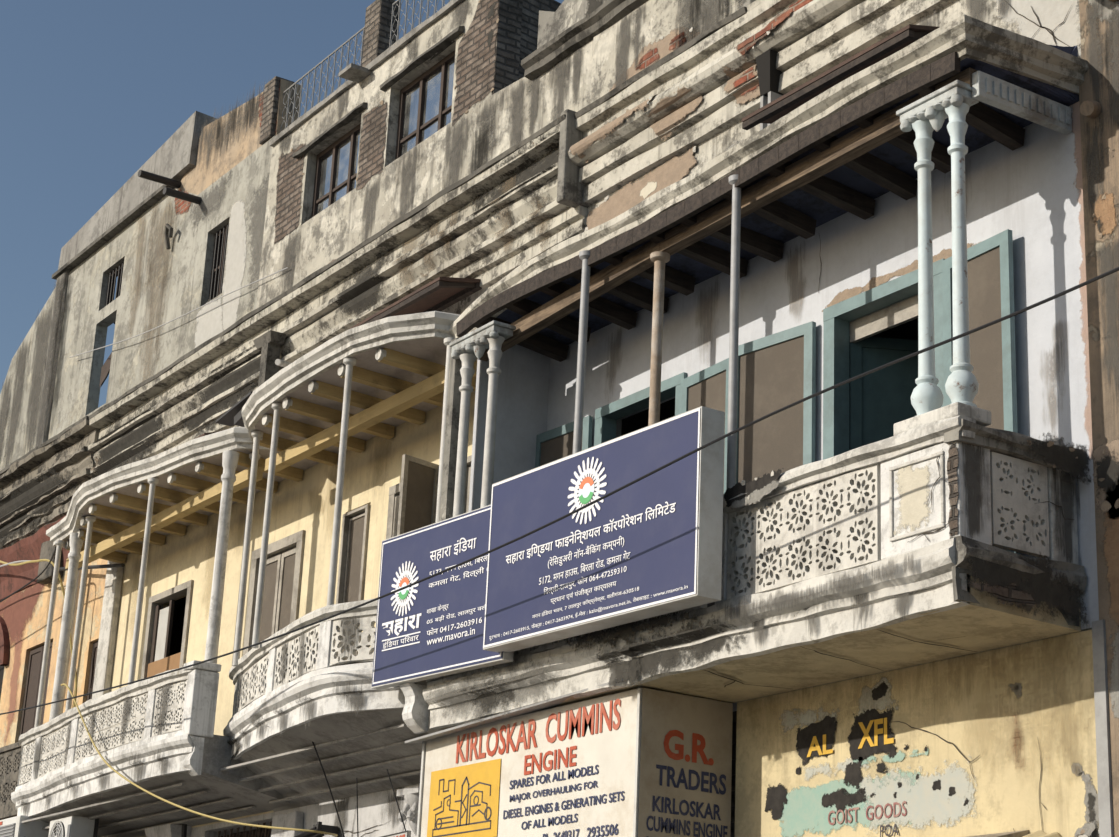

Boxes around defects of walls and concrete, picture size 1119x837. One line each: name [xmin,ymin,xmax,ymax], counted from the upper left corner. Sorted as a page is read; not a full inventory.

crack [1009,4,1070,47]
water stain [442,48,583,225]
spalling [567,86,703,163]
spalling [584,145,697,232]
water stain [334,253,387,320]
water stain [0,272,66,468]
water stain [93,345,261,477]
peeling [1021,101,1119,718]
water stain [566,556,914,690]
crack [875,719,980,780]
peeling [932,779,968,805]
spalling [1071,763,1099,837]